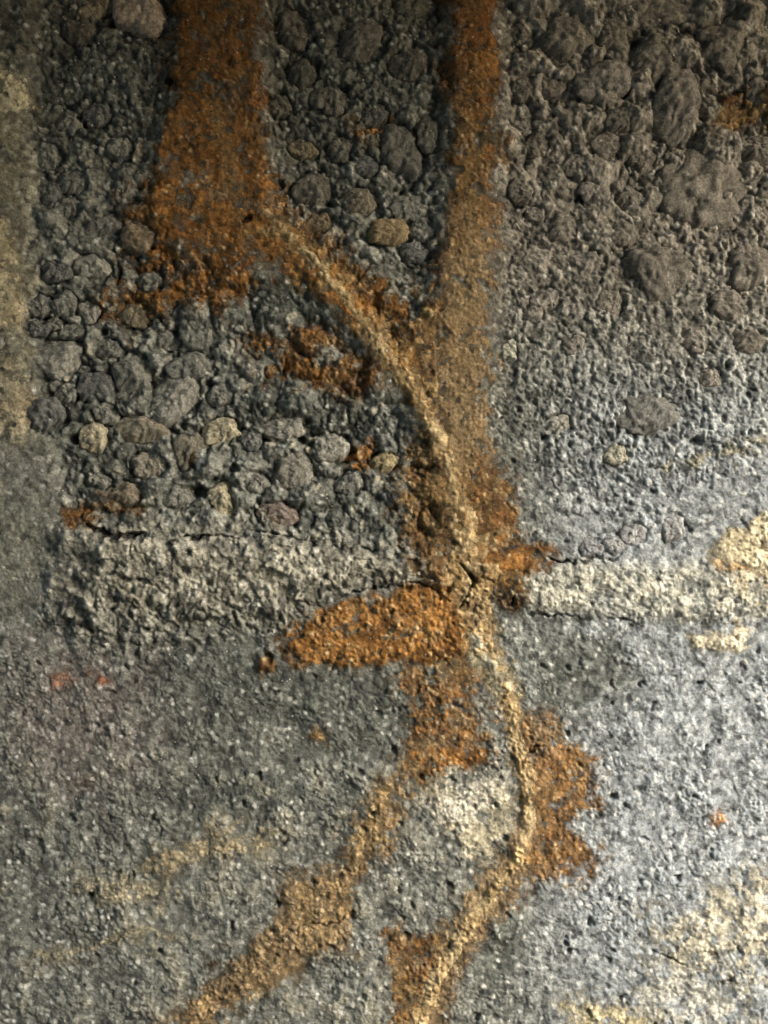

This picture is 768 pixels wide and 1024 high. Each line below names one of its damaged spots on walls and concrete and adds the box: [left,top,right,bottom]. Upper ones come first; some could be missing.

rust [91,0,611,910]
crack [94,527,142,542]
crack [169,533,232,546]
crack [547,556,614,565]
crack [254,201,585,1024]
rust [380,922,445,1024]